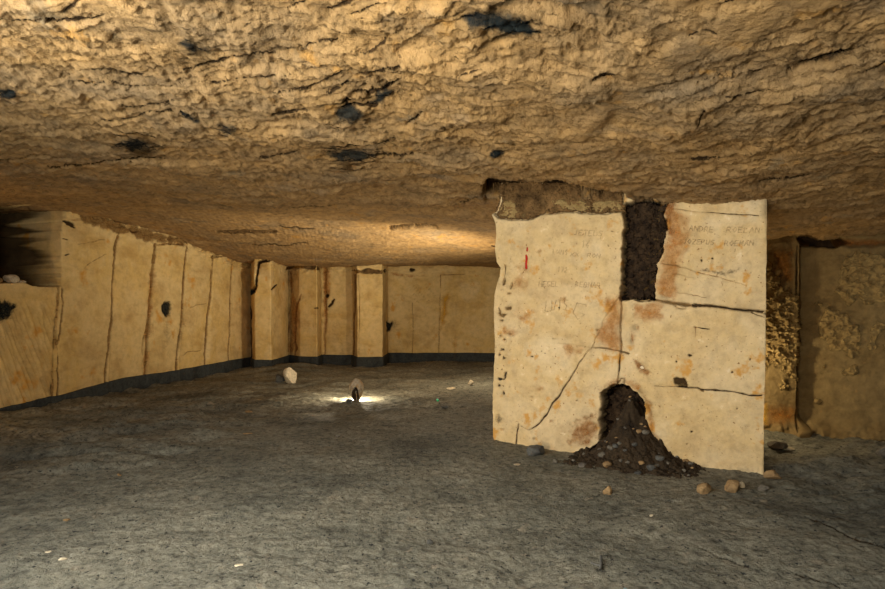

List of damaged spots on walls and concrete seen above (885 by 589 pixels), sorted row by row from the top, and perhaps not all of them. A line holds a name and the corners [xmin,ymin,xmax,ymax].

crack [516,300,624,444]
crack [662,378,762,396]